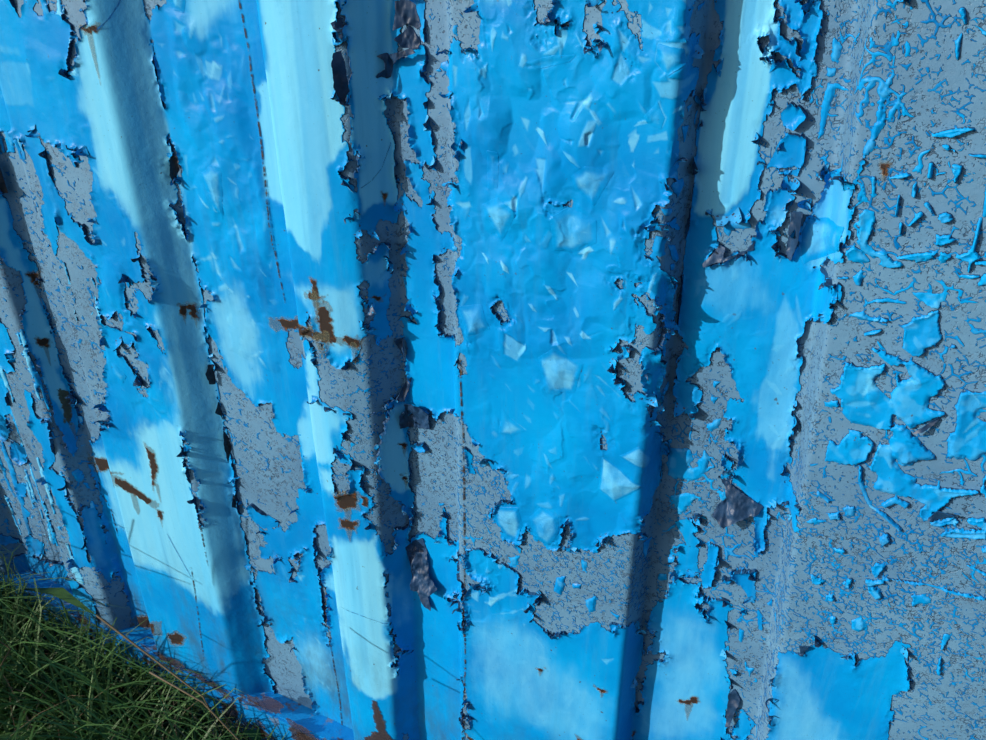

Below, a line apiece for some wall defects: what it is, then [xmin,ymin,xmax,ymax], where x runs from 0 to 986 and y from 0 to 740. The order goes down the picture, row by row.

peeling [14,0,87,80]
peeling [166,134,188,235]
rust [278,279,359,348]
peeling [0,124,157,631]
peeling [286,0,986,740]
rust [94,458,162,519]
rust [146,448,157,485]
peeling [176,430,204,526]
peeling [205,336,332,709]
rust [334,493,367,530]
rust [141,644,327,740]
rust [364,701,393,740]